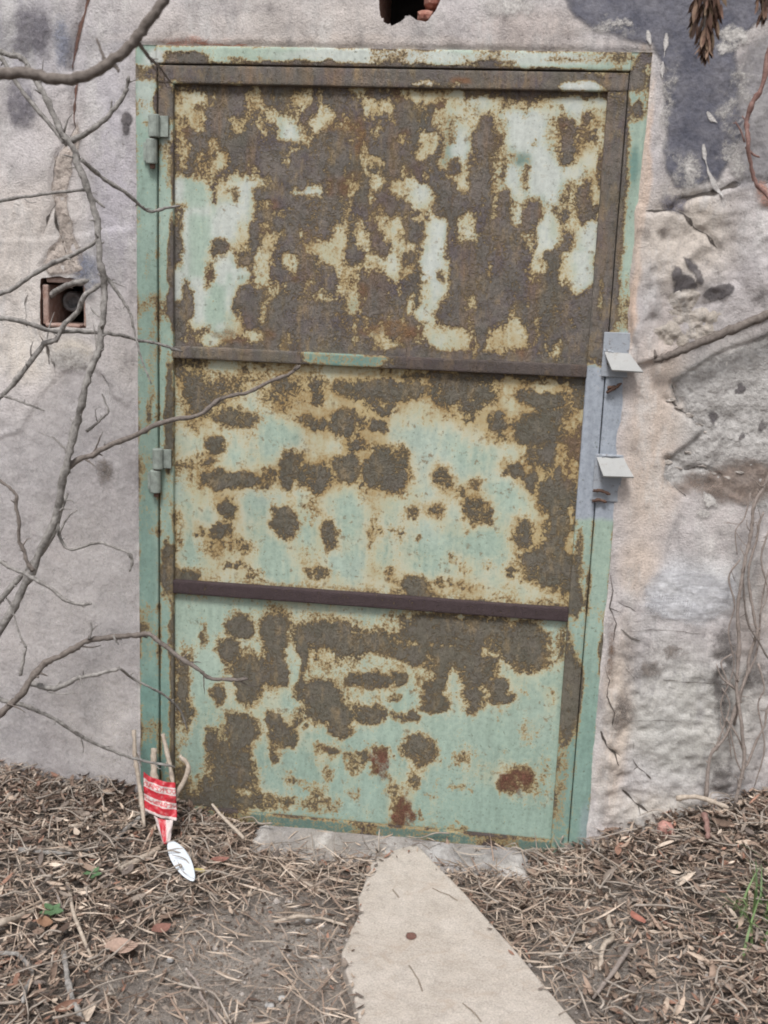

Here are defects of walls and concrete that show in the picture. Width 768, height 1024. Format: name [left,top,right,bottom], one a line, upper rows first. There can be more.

hole [379,0,440,26]
leakage [646,30,668,77]
leakage [684,144,723,197]
crack [646,179,768,248]
crack [600,667,682,813]
rust [499,770,533,792]
rust [391,797,416,825]